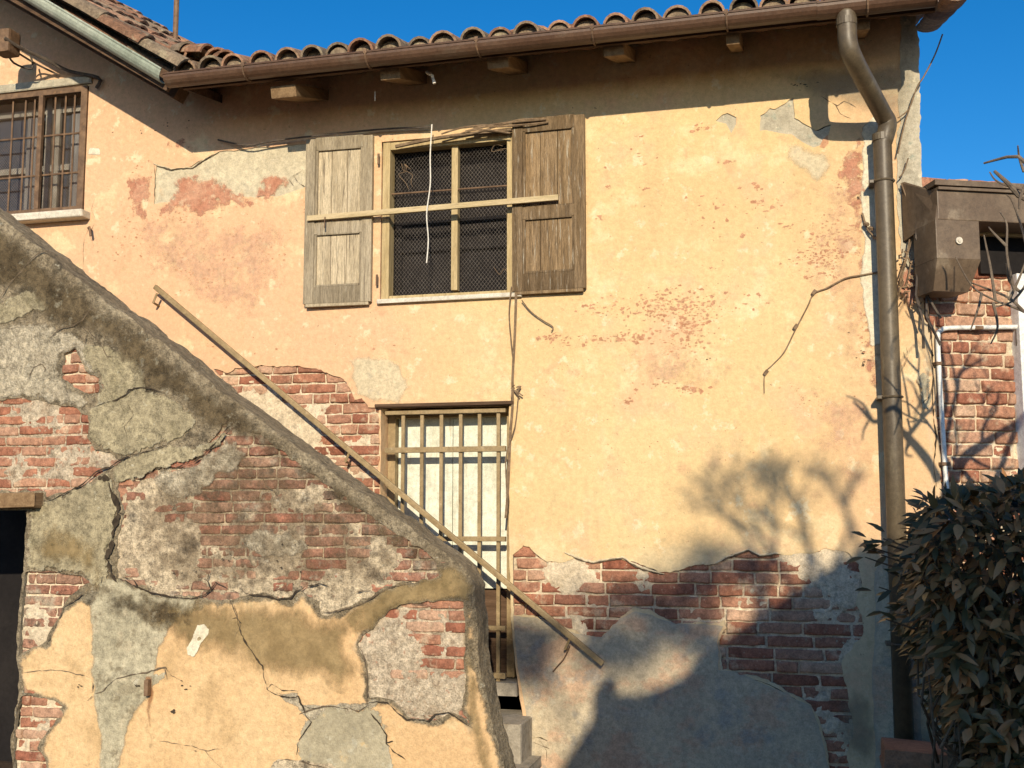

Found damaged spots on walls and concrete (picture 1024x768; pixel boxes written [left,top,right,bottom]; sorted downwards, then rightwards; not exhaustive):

spalling [760,99,830,148]
spalling [110,144,306,295]
peeling [697,182,783,237]
flaking render [62,349,103,394]
peeling [215,343,407,494]
flaking render [15,686,63,768]
flaking render [22,570,89,652]
flaking render [0,397,445,616]
crack [23,387,469,768]
flaking render [511,546,864,768]